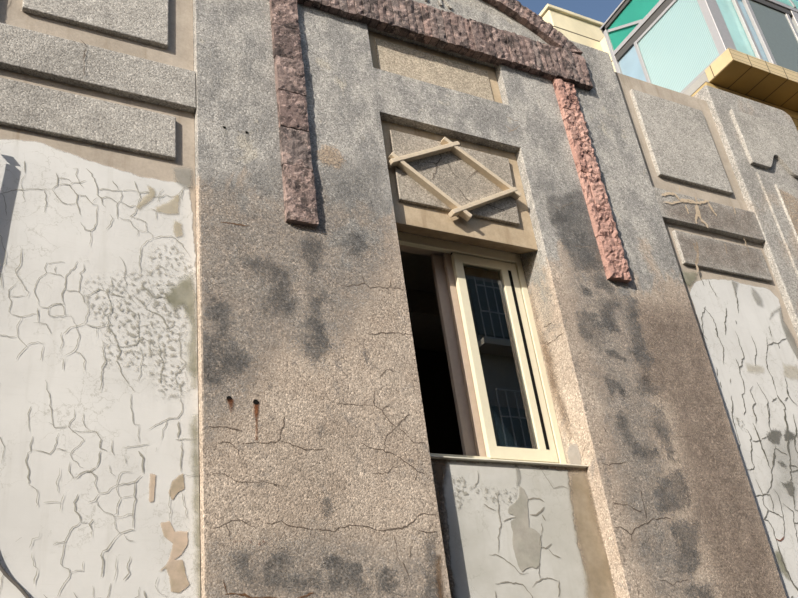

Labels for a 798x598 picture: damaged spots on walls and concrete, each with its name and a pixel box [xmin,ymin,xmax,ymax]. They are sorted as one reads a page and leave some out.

water stain [157,195,182,236]
water stain [662,187,717,228]
water stain [201,144,383,399]
crack [0,161,325,598]
peeling [169,474,185,499]
crack [335,369,423,481]
water stain [567,444,581,465]
crack [698,272,798,598]
peeling [161,521,189,593]
crack [212,513,437,580]
crack [485,467,569,598]